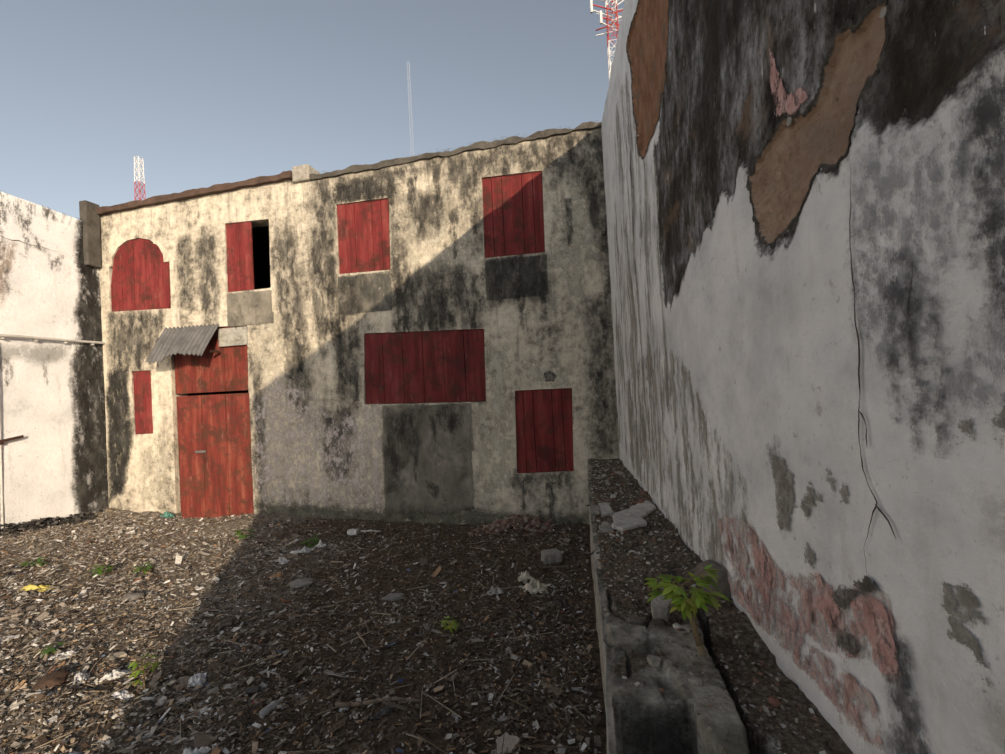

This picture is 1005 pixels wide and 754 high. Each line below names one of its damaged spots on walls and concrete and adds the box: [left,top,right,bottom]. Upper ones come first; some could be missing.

leakage [0,194,45,251]
leakage [1,220,163,513]
leakage [177,231,219,325]
leakage [249,362,511,525]
leakage [272,130,609,482]
leakage [513,472,588,525]
leakage [586,271,617,455]
peeling [614,0,901,746]
leakage [653,0,873,312]
crack [849,161,896,567]
leakage [851,0,1005,448]